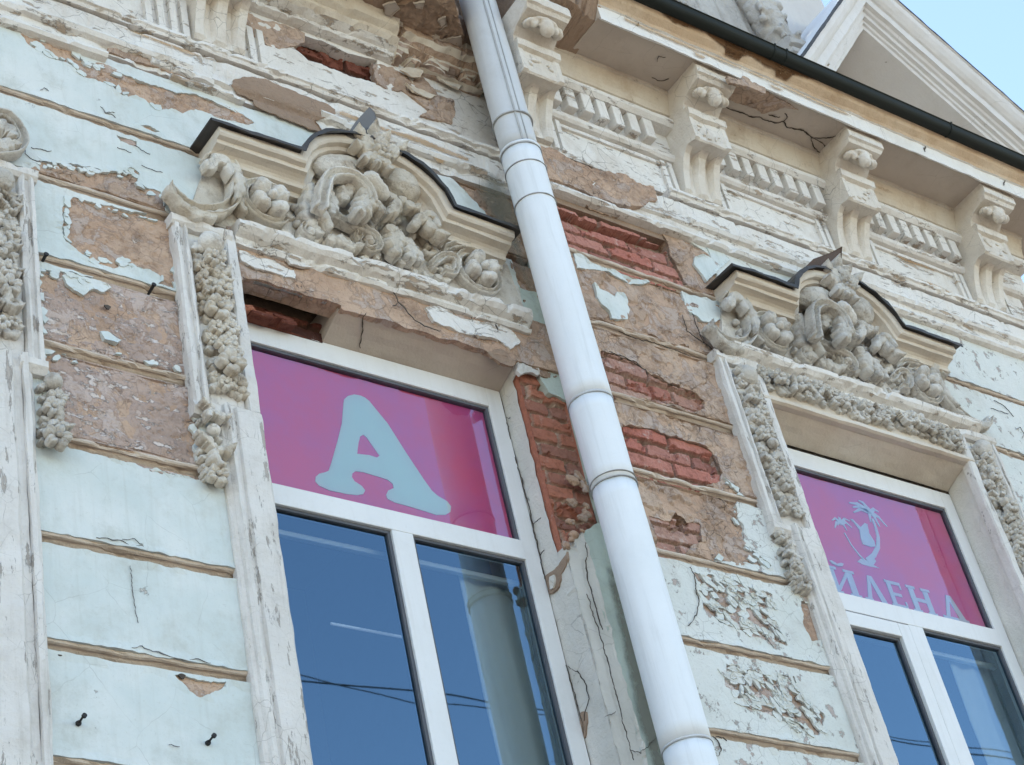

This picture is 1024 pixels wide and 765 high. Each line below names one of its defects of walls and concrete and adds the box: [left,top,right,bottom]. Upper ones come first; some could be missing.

spalling [21,34,336,132]
spalling [246,13,463,125]
crack [726,107,835,153]
spalling [456,181,538,302]
peeling [29,160,199,480]
flaking render [424,305,596,594]
peeling [540,145,787,647]
crack [96,537,208,663]
peeling [176,676,224,697]
crack [566,543,657,760]
peeling [717,663,829,738]
peeling [801,603,818,641]